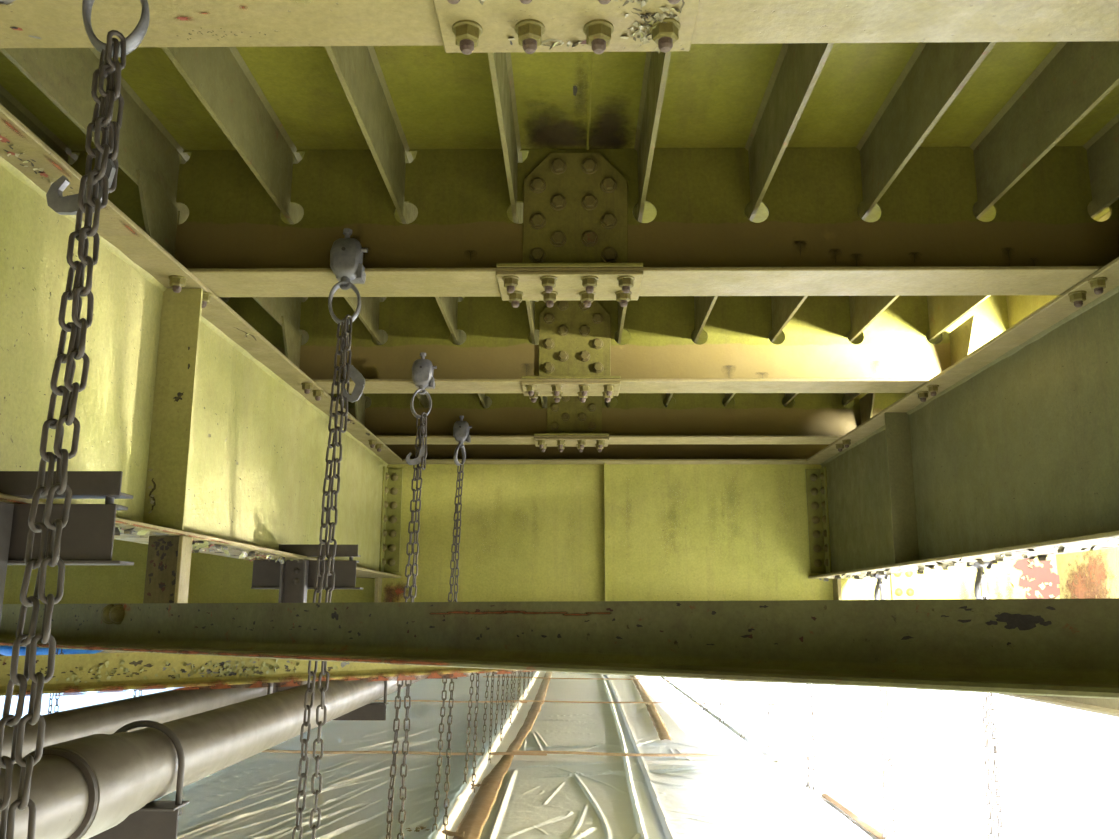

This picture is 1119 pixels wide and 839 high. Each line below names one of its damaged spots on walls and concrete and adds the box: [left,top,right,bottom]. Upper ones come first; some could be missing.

peeling [613,0,685,53]
leakage [530,105,626,148]
peeling [0,120,64,184]
peeling [114,524,178,603]
peeling [192,540,304,564]
peeling [819,537,1119,581]
corrosion [429,605,615,628]
corrosion [986,554,1113,645]
peeling [44,657,308,685]